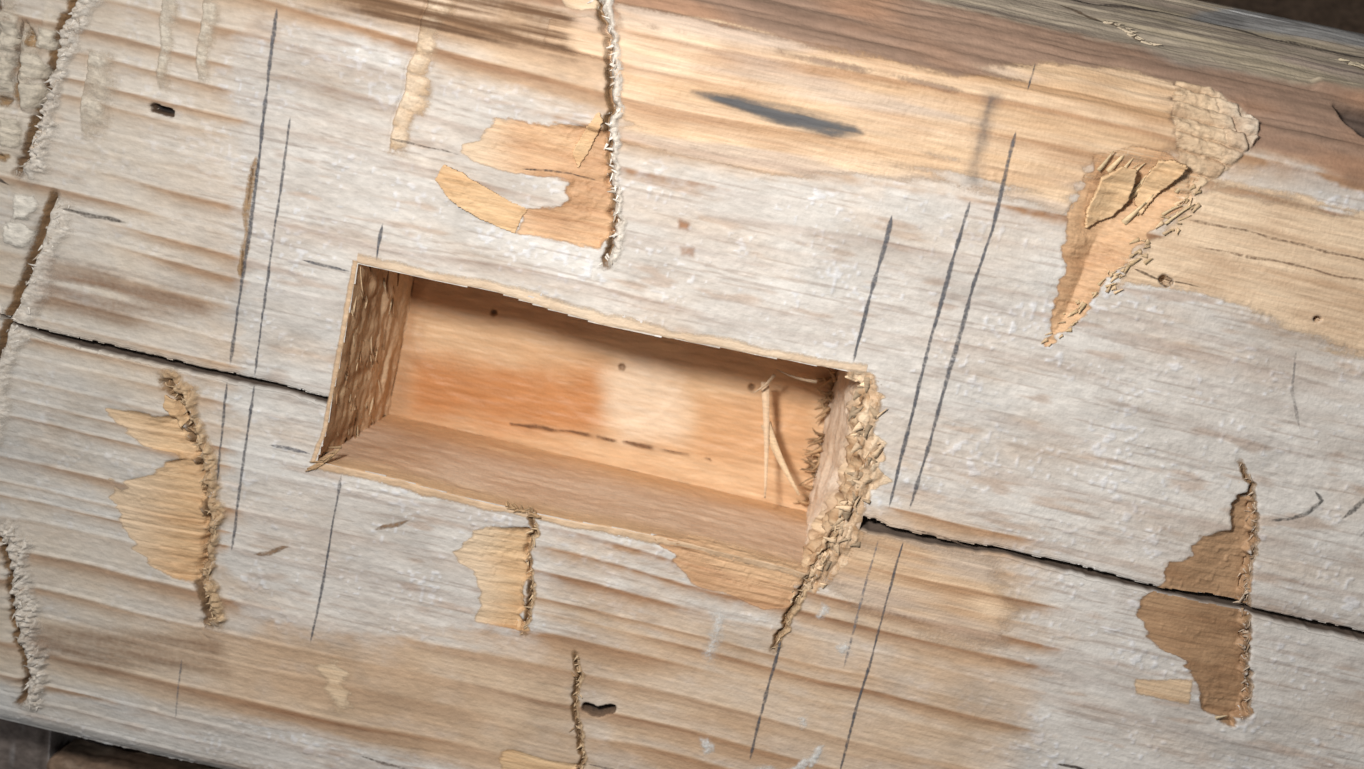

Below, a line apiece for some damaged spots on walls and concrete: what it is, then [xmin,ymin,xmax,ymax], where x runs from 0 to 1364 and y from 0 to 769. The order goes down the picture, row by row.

peeling [435,164,528,233]
crack [0,310,329,407]
crack [860,514,1364,644]
peeling [1135,679,1193,704]